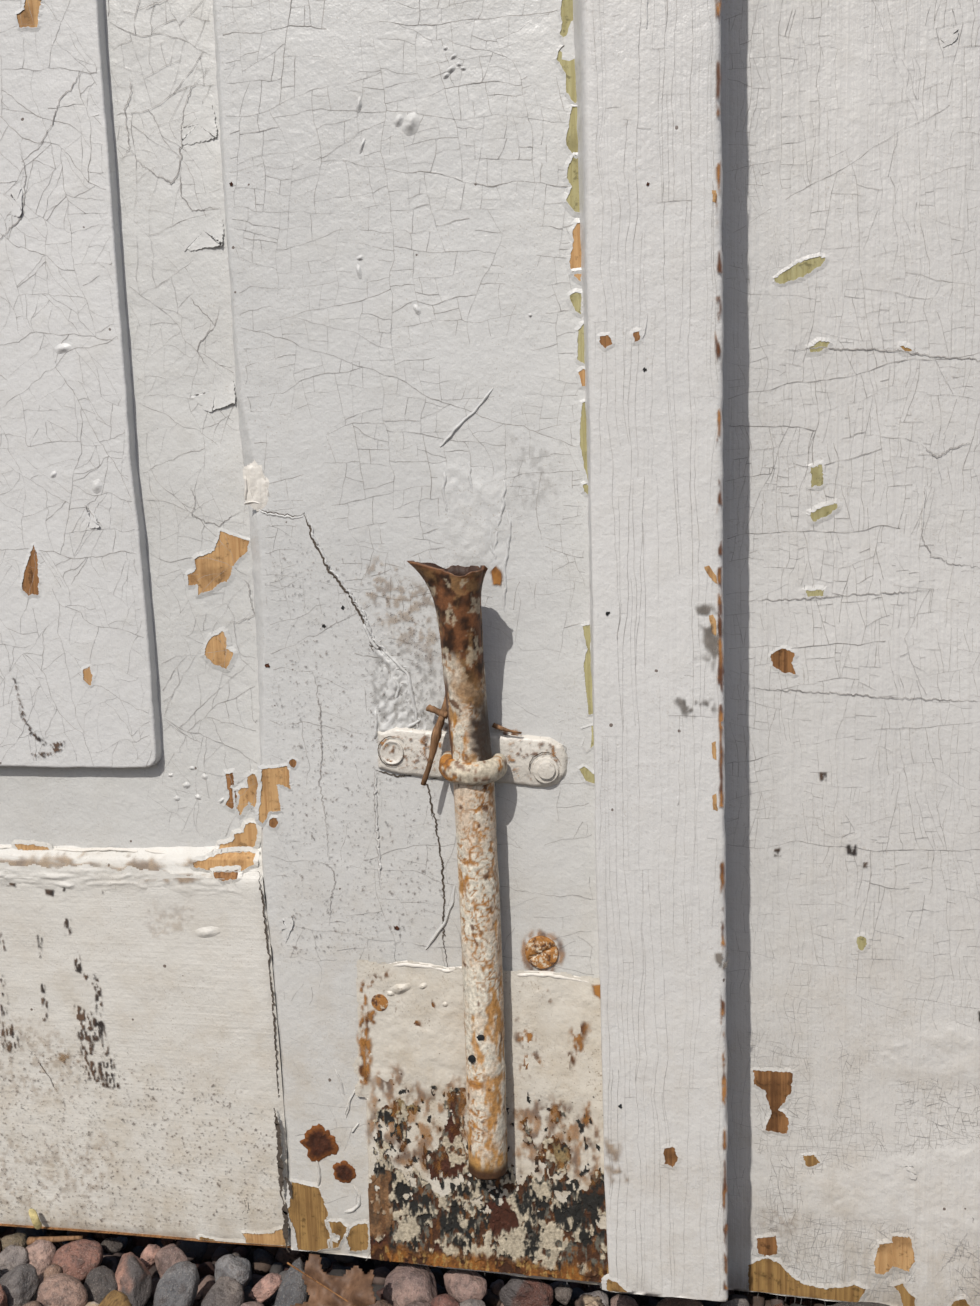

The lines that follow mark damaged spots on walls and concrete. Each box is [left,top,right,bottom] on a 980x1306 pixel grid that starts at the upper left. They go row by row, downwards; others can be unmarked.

peeling [14,0,45,32]
peeling [553,0,645,498]
peeling [19,542,43,599]
peeling [184,528,251,599]
corrosion [491,566,502,585]
crack [0,0,585,1252]
peeling [189,757,300,885]
corrosion [522,932,563,971]
corrosion [300,973,619,1283]
peeling [750,1067,796,1137]
peeling [196,1178,370,1254]
peeling [745,1232,918,1306]